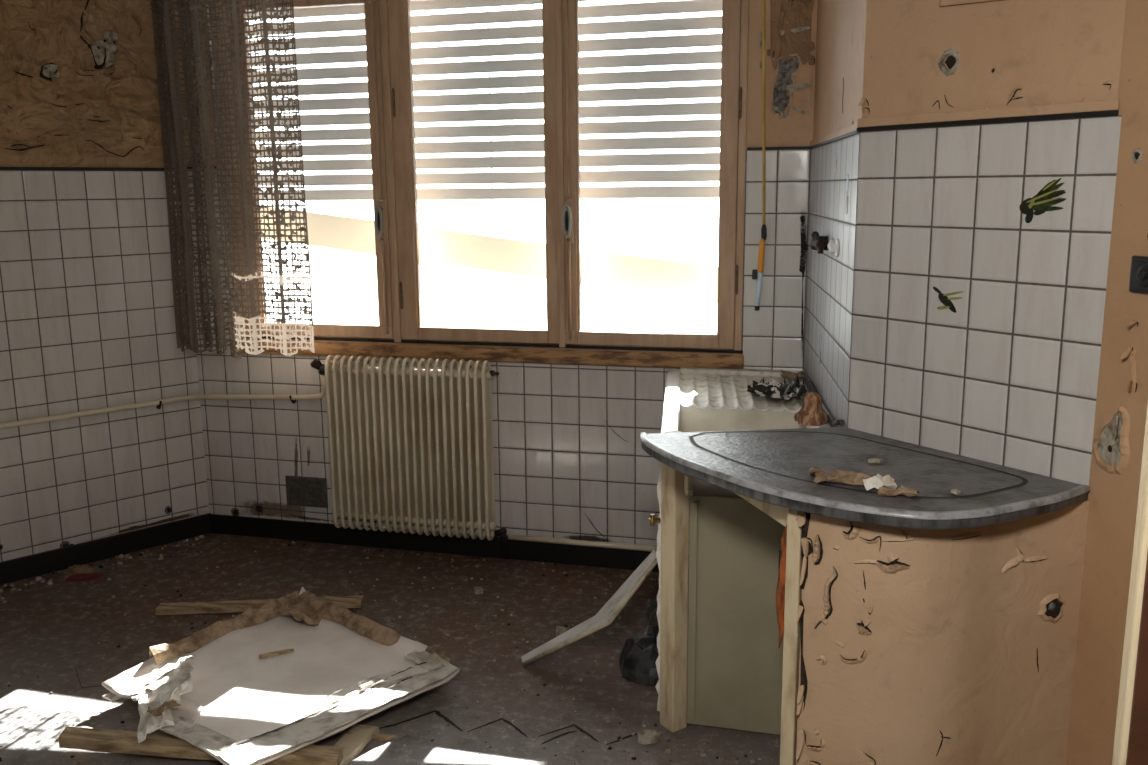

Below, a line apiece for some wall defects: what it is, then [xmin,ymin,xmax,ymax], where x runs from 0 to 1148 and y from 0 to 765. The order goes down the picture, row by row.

crack [5,0,144,160]
flaking render [87,32,121,74]
peeling [759,0,815,120]
flaking render [1092,406,1130,474]
peeling [796,510,813,715]